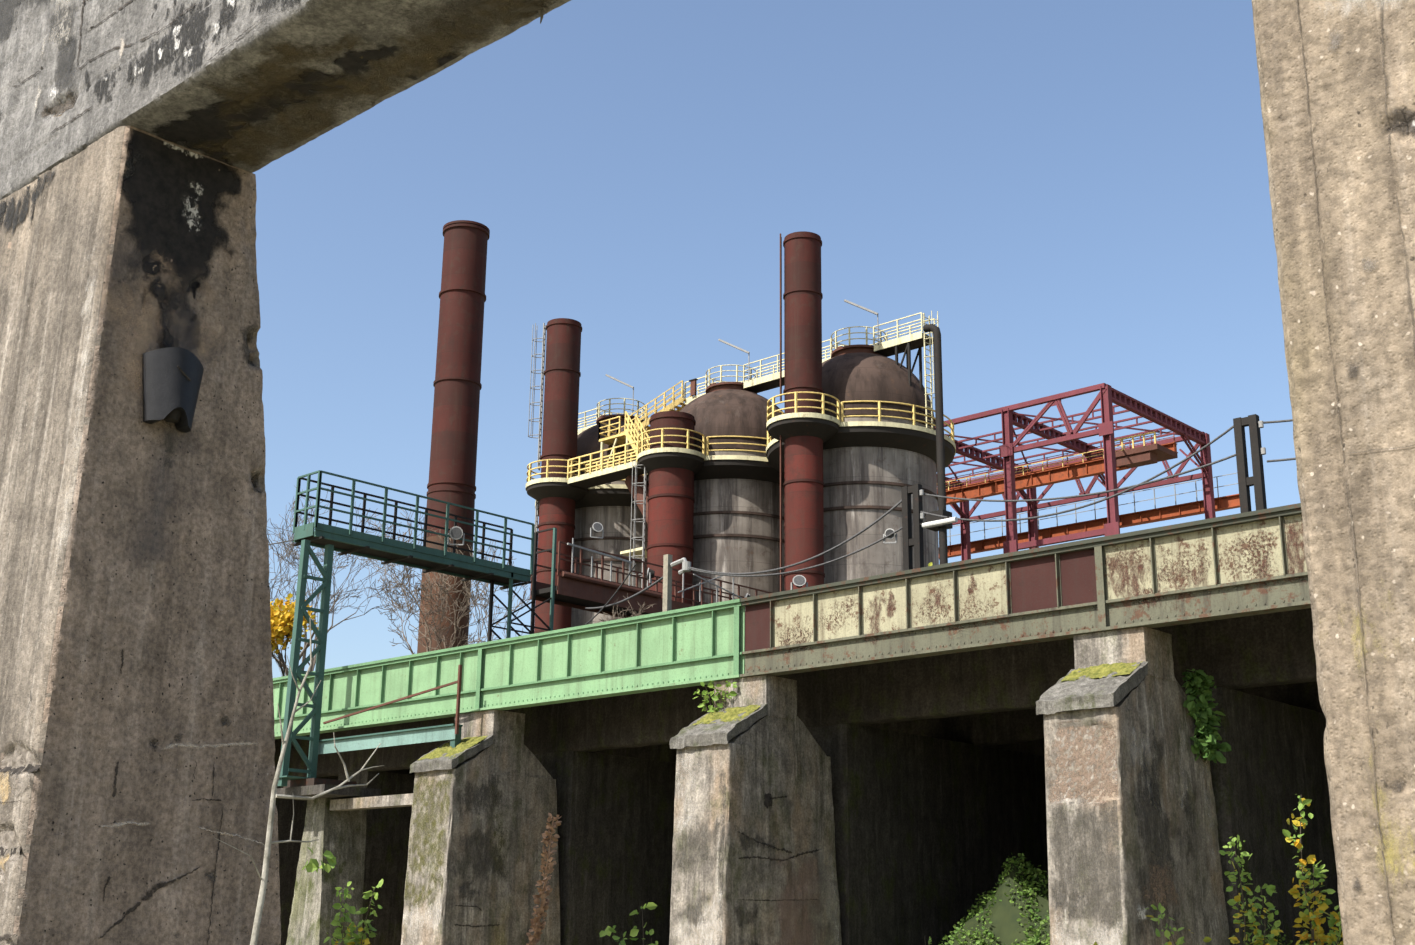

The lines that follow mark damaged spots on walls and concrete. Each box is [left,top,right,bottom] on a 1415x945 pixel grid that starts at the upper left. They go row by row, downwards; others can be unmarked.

water stain [0,0,76,92]
spalling [1386,109,1415,135]
water stain [183,183,203,231]
water stain [142,259,190,349]
rust [778,591,896,651]
rust [916,574,1002,631]
rust [1105,520,1306,609]
spalling [0,825,21,880]
crack [100,761,223,944]
water stain [673,822,765,927]